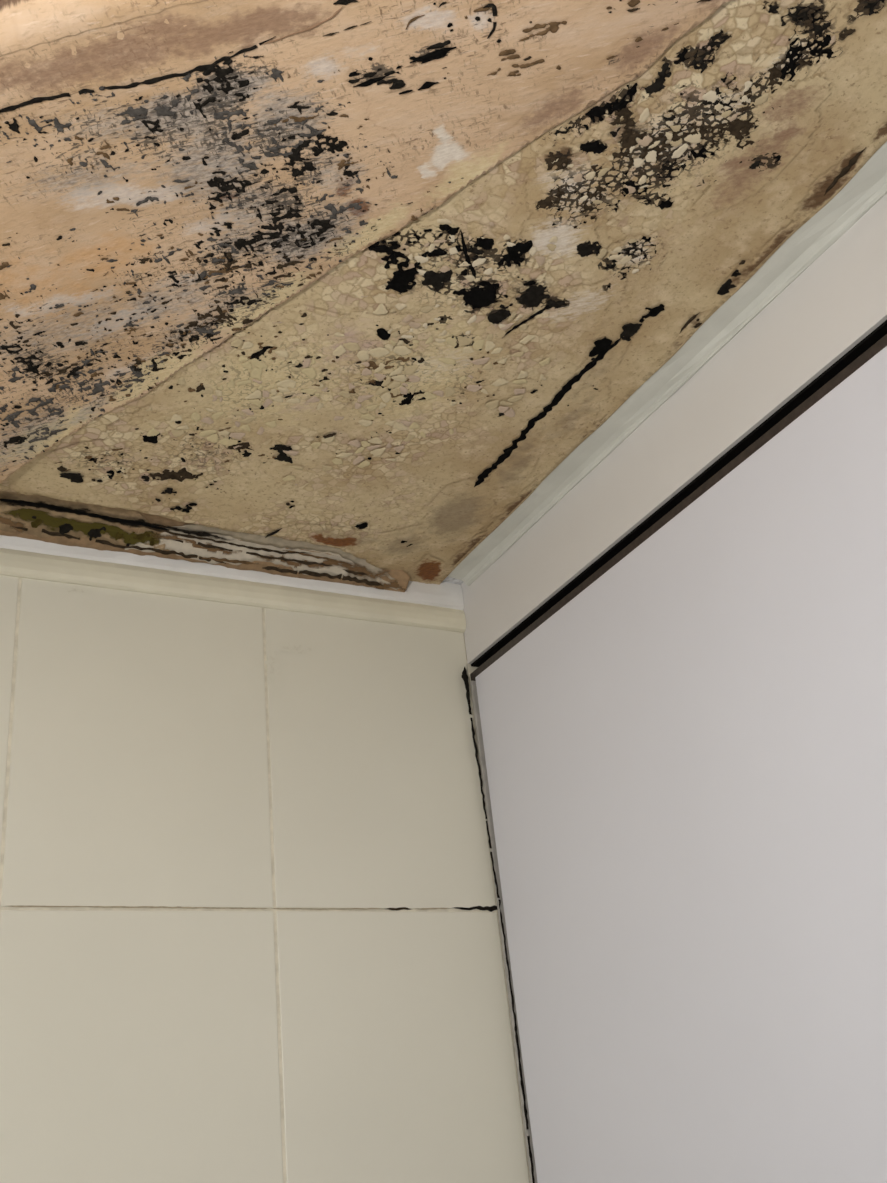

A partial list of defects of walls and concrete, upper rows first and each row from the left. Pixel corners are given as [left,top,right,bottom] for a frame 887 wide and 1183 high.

crack [0,0,358,119]
peeling [287,40,387,80]
peeling [390,0,501,39]
leakage [0,0,887,479]
leakage [0,304,665,591]